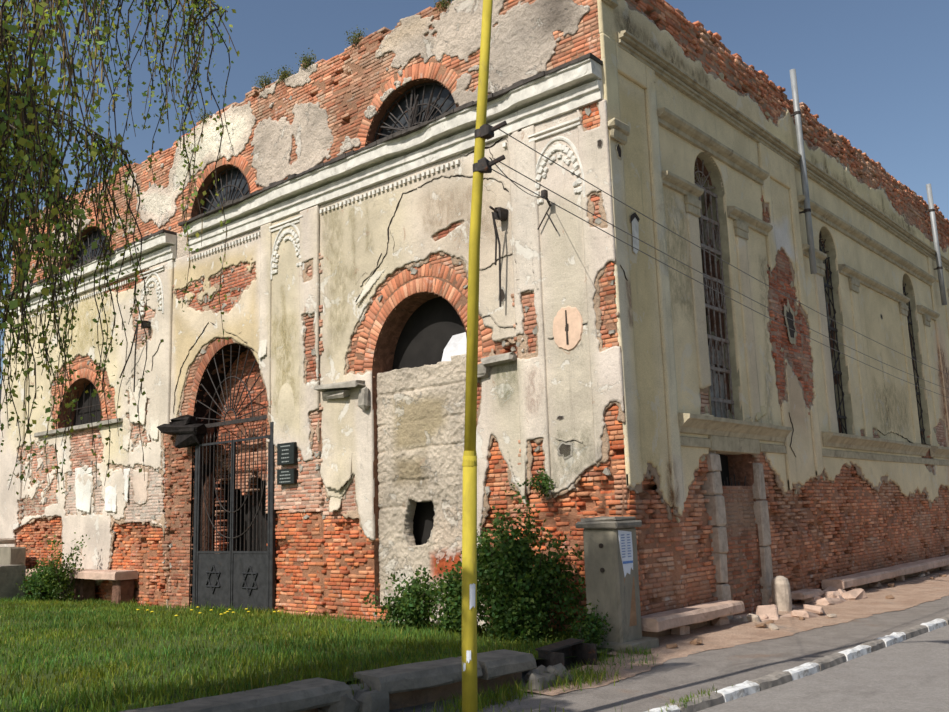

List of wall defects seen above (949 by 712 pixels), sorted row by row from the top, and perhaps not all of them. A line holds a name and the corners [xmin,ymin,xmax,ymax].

spalling [546,0,601,71]
spalling [173,262,256,313]
spalling [10,22,480,293]
crack [355,129,522,302]
spalling [581,102,603,149]
spalling [597,262,619,348]
spalling [625,0,949,254]
spalling [767,250,814,415]
spalling [15,355,195,608]
spalling [266,403,391,622]
spalling [482,403,721,635]
spalling [744,452,949,603]